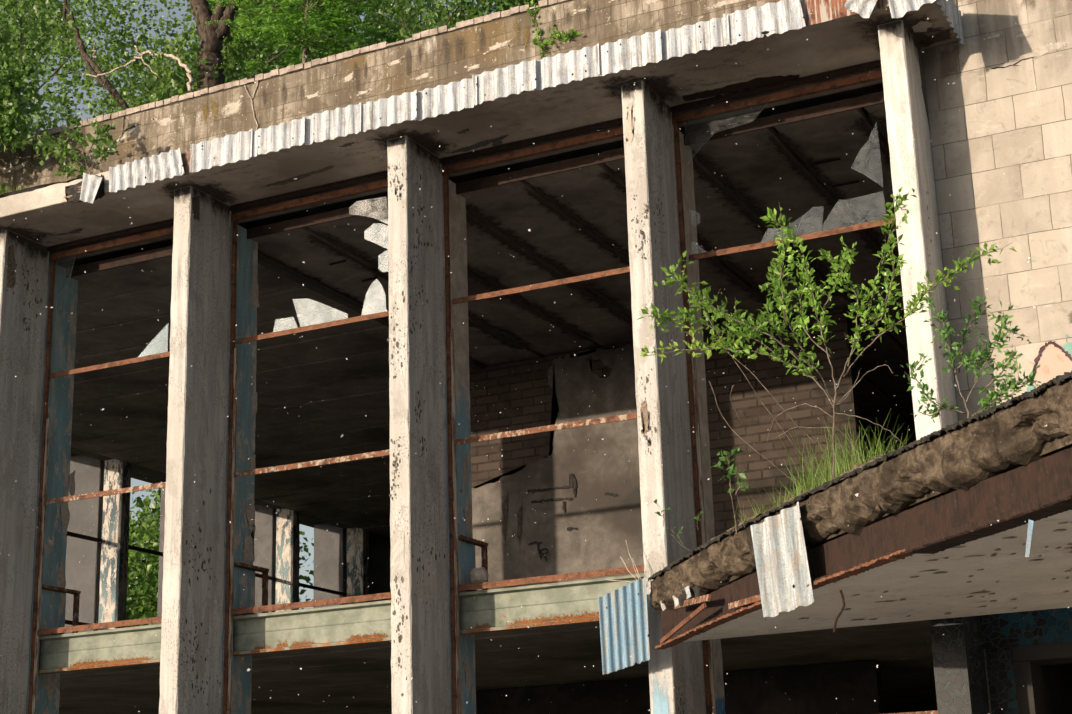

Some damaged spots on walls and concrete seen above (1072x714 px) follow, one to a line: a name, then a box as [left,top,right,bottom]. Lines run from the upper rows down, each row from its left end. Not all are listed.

leakage [406,36,463,75]
leakage [603,75,687,117]
flaking render [472,344,1072,612]
peeling [60,470,75,537]
peeling [242,499,256,565]
peeling [56,565,66,588]
rust [61,657,153,670]
rust [251,641,316,653]
rust [345,633,388,644]
rust [509,612,599,629]